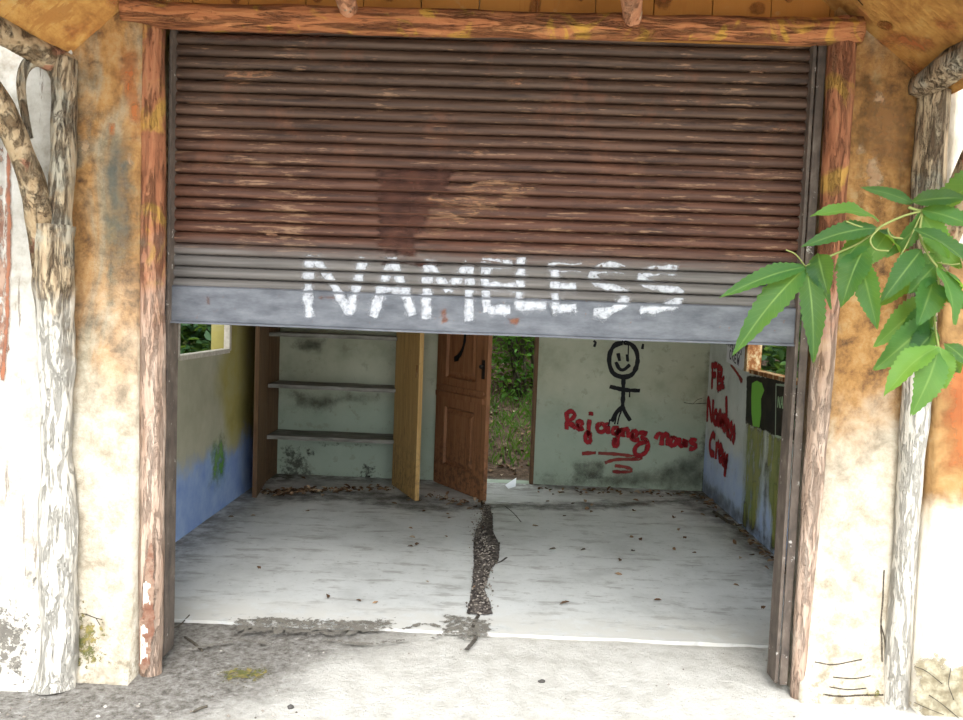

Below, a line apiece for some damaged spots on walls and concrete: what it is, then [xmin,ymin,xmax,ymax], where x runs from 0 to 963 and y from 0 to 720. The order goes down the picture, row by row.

peeling [0,186,9,381]
rust [376,168,452,266]
crack [464,501,545,650]